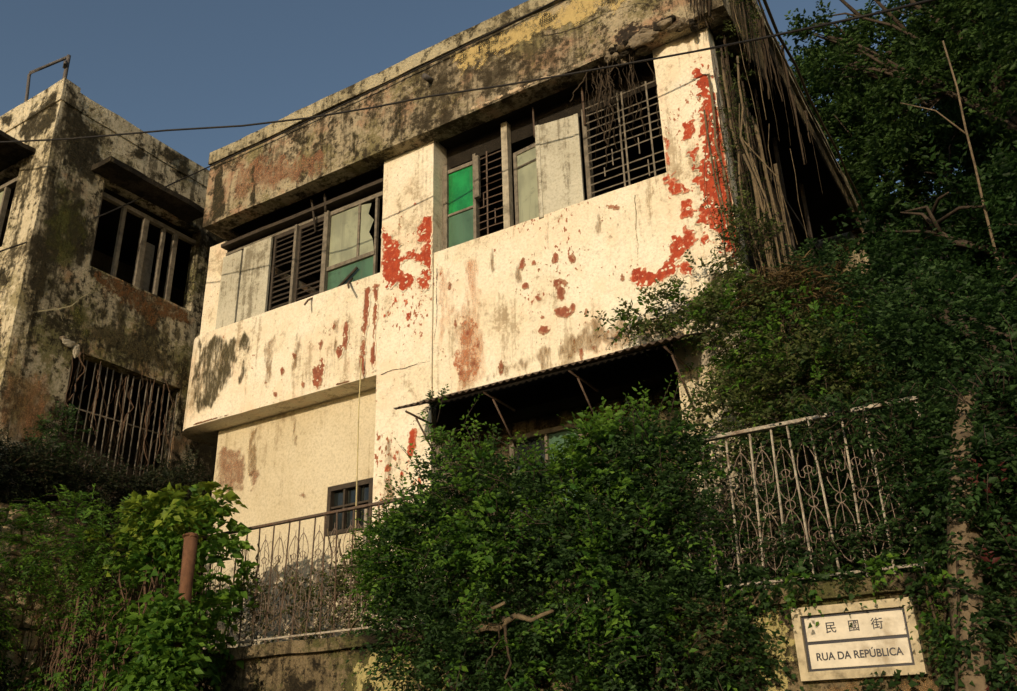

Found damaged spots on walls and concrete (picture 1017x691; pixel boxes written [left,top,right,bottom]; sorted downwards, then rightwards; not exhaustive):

water stain [19,87,102,185]
mould [131,143,145,159]
mould [163,147,189,178]
water stain [211,165,225,221]
water stain [285,132,326,160]
peeling [613,57,741,294]
water stain [23,160,86,325]
peeling [295,215,433,392]
peeling [509,248,588,344]
water stain [88,299,249,413]